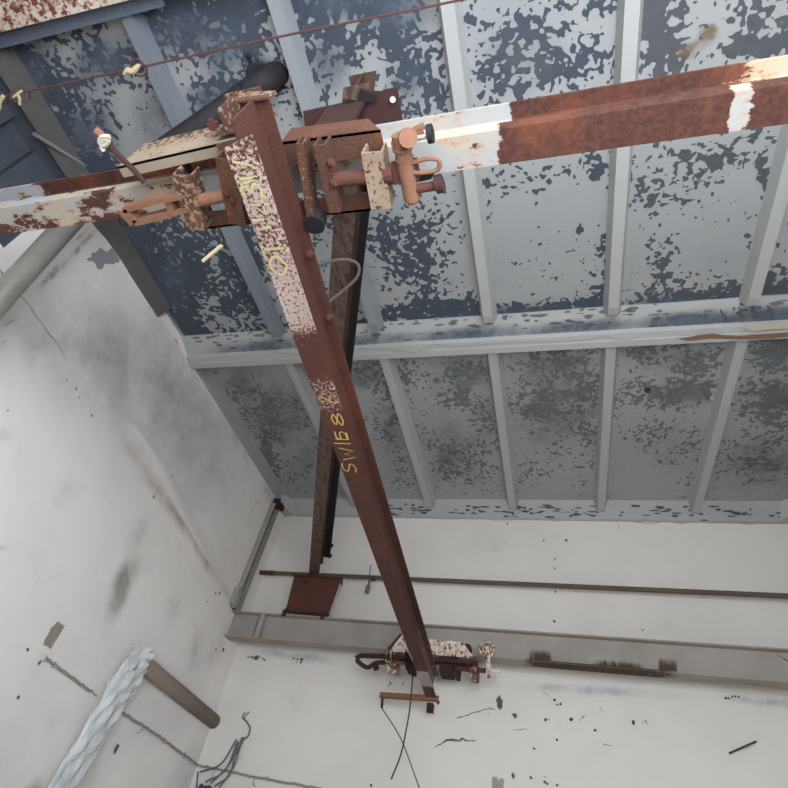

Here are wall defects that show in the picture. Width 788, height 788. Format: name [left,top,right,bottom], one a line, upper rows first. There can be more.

peeling [13,22,166,174]
peeling [144,0,289,114]
peeling [291,0,451,119]
peeling [462,0,617,106]
peeling [639,0,788,77]
peeling [482,151,610,223]
peeling [133,215,270,349]
peeling [356,184,493,341]
peeling [496,217,611,332]
peeling [613,127,788,521]
damp [115,571,128,605]
crack [435,737,475,747]